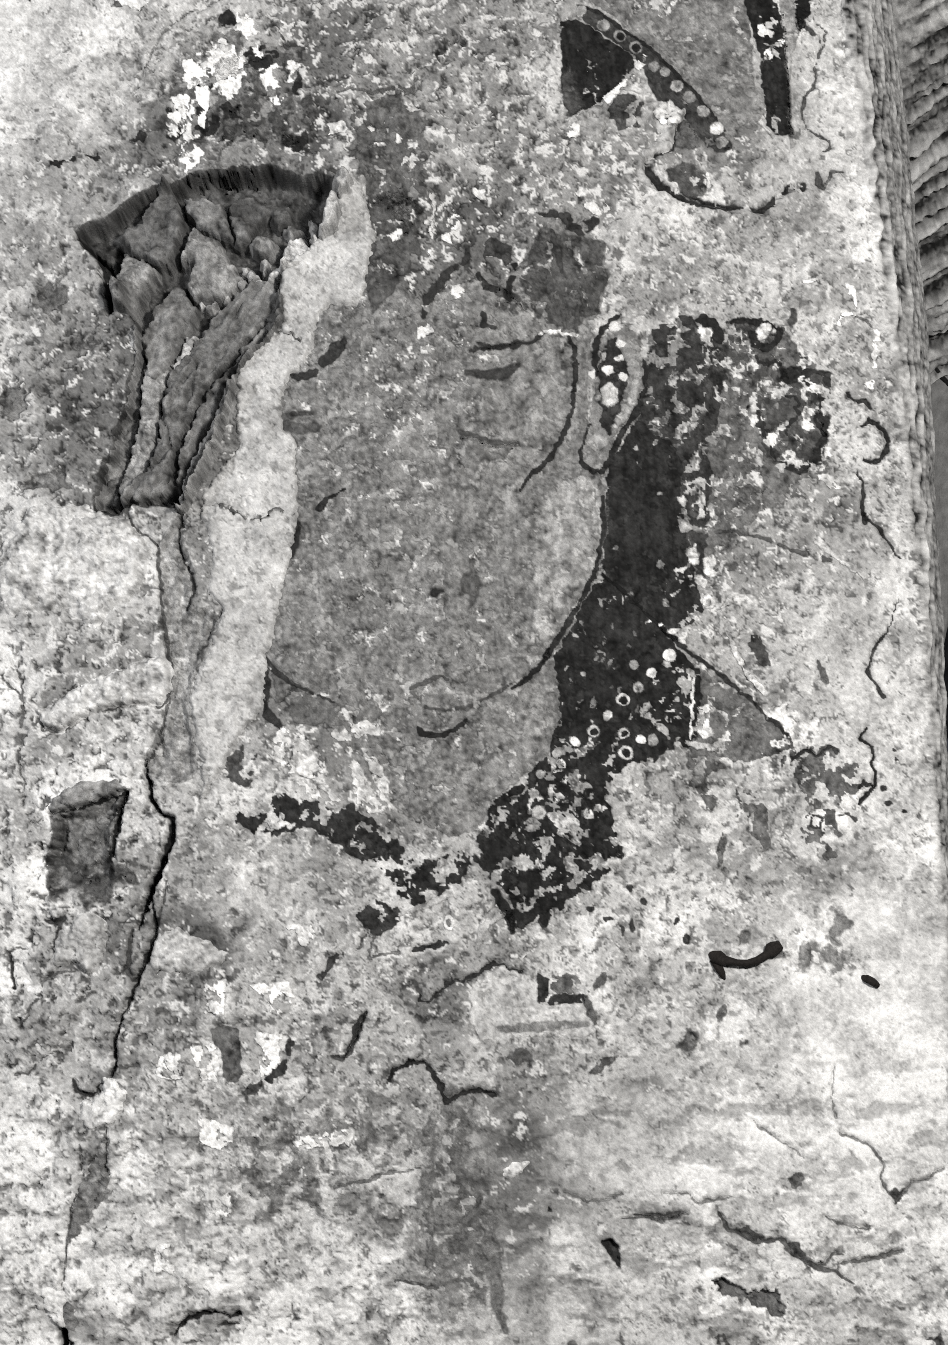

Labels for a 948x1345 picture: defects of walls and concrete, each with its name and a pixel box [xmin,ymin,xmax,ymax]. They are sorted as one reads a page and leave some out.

crack [846,392,901,559]
spalling [45,779,140,911]
crack [8,503,294,1097]
crack [754,1120,804,1158]
crack [832,1065,944,1204]
crack [61,1129,110,1345]
crack [564,1191,904,1284]